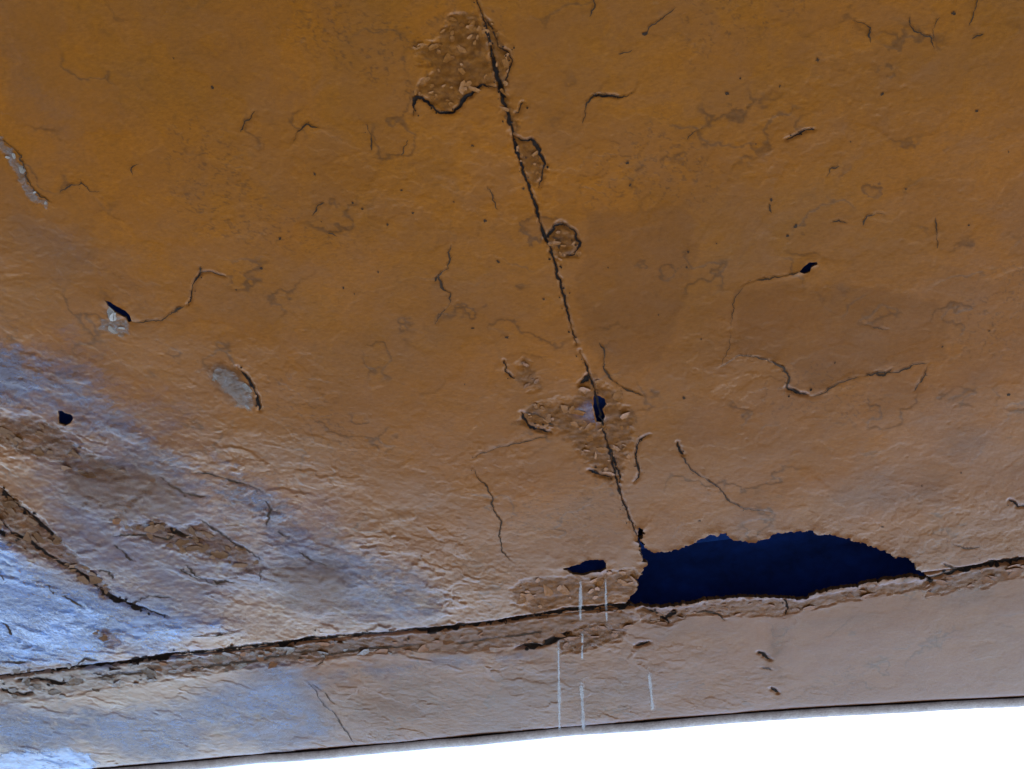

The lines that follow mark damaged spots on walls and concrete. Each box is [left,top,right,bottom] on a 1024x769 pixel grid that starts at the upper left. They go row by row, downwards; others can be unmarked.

peeling [413,12,543,190]
peeling [0,137,47,208]
crack [412,1,647,535]
crack [721,272,927,397]
peeling [0,411,127,482]
crack [0,472,327,618]
crack [471,413,554,562]
peeling [522,378,636,483]
spalling [514,528,953,650]
crack [926,544,1024,583]
peeling [967,564,1024,587]
crack [0,603,725,742]